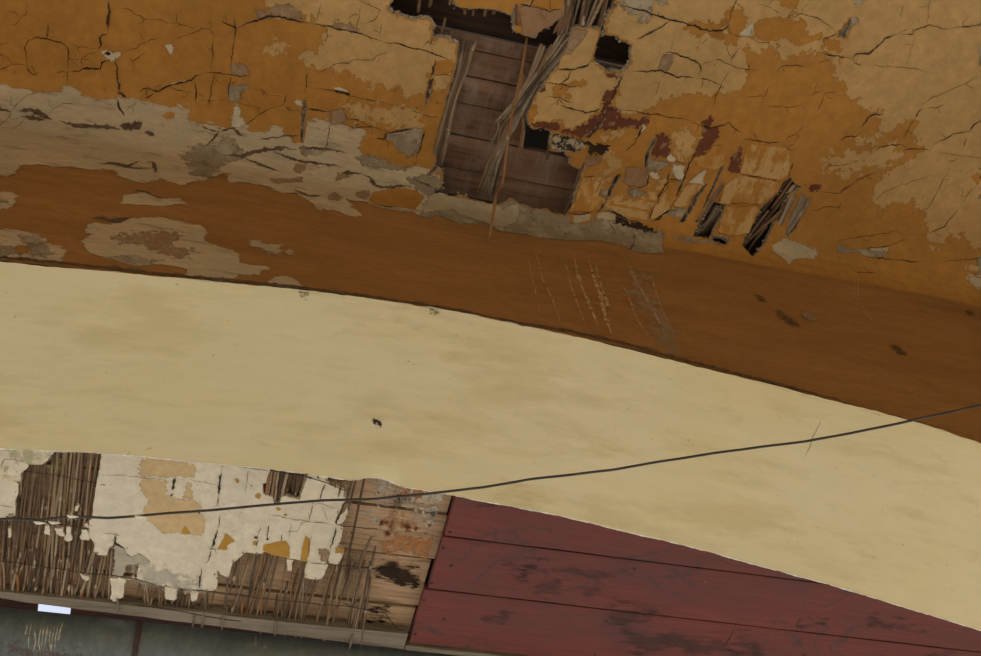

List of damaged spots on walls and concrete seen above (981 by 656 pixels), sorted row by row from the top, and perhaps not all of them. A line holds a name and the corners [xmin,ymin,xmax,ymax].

crack [0,1,451,153]
peeling [0,0,981,290]
crack [546,0,981,273]
peeling [112,545,150,578]
crack [106,465,267,588]
crack [256,476,345,565]
peeling [318,549,330,564]
damp [356,478,444,589]